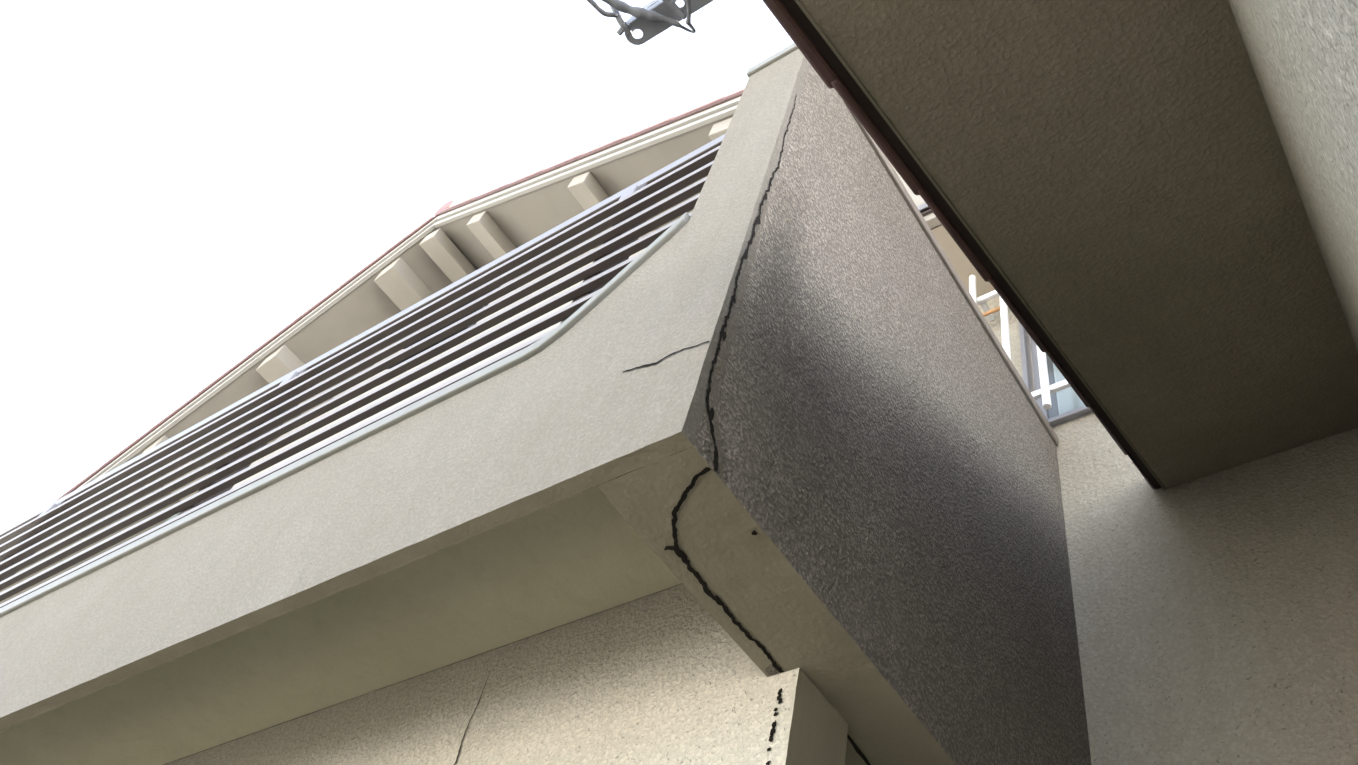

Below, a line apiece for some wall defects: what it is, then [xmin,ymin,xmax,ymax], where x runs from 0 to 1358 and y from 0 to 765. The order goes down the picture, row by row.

crack [623,95,797,675]
crack [454,675,489,765]